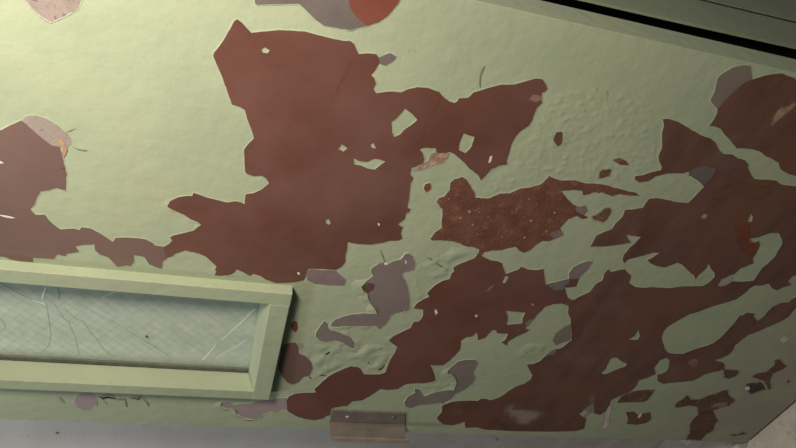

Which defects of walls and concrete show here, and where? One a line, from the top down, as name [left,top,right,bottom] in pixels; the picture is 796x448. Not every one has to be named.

peeling [22,0,84,24]
peeling [253,0,401,32]
peeling [0,18,548,286]
corrosion [429,158,640,255]
peeling [214,64,796,432]
peeling [57,392,98,411]
peeling [673,388,737,440]
corrosion [745,358,789,394]